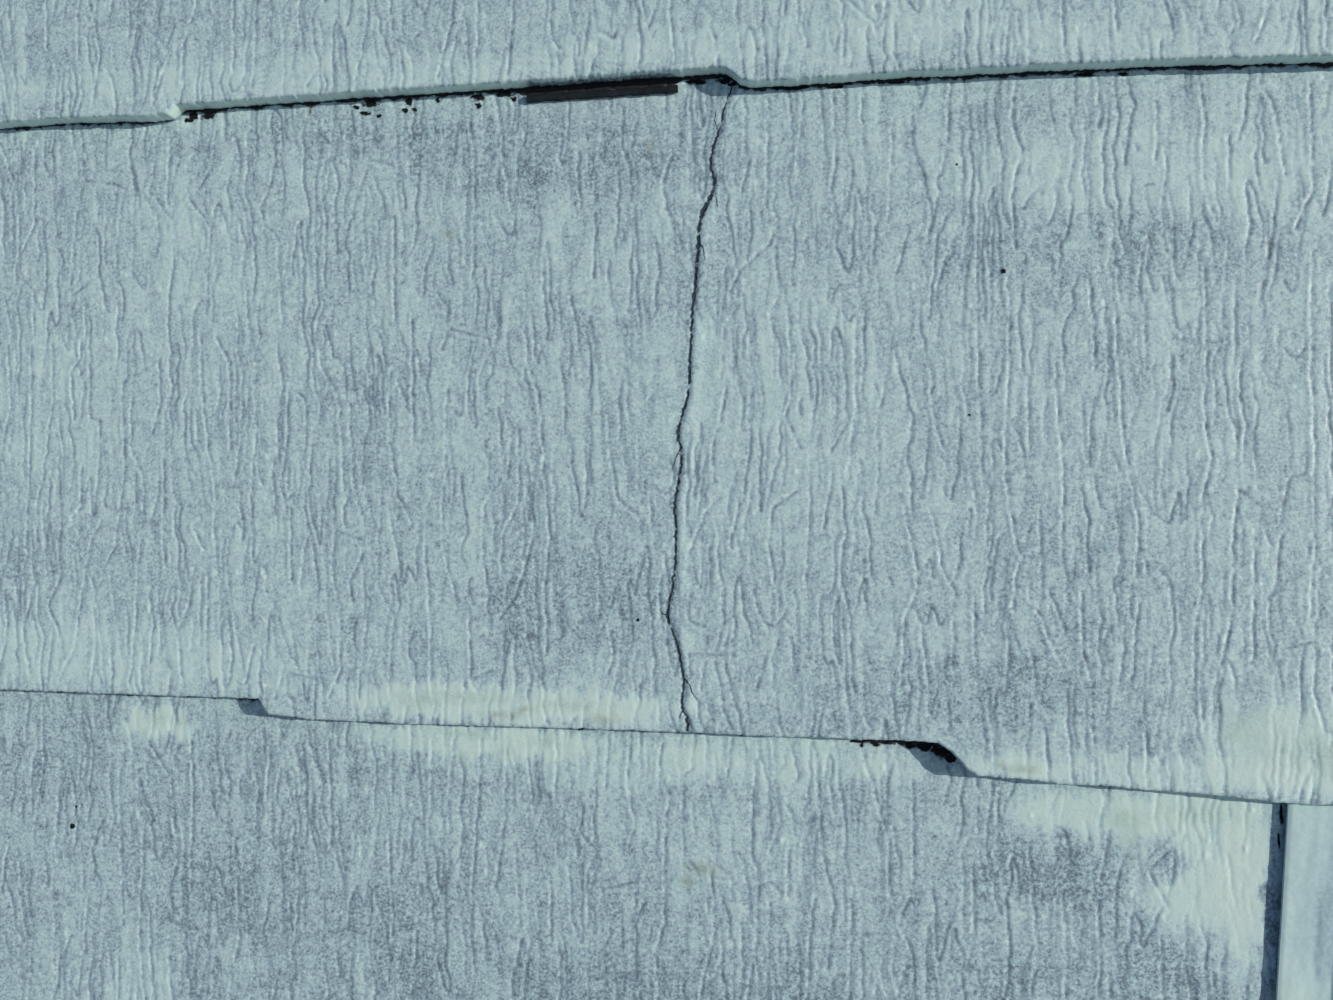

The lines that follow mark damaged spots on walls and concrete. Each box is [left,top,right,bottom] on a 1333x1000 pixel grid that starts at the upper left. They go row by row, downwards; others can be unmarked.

crack [660,87,733,731]